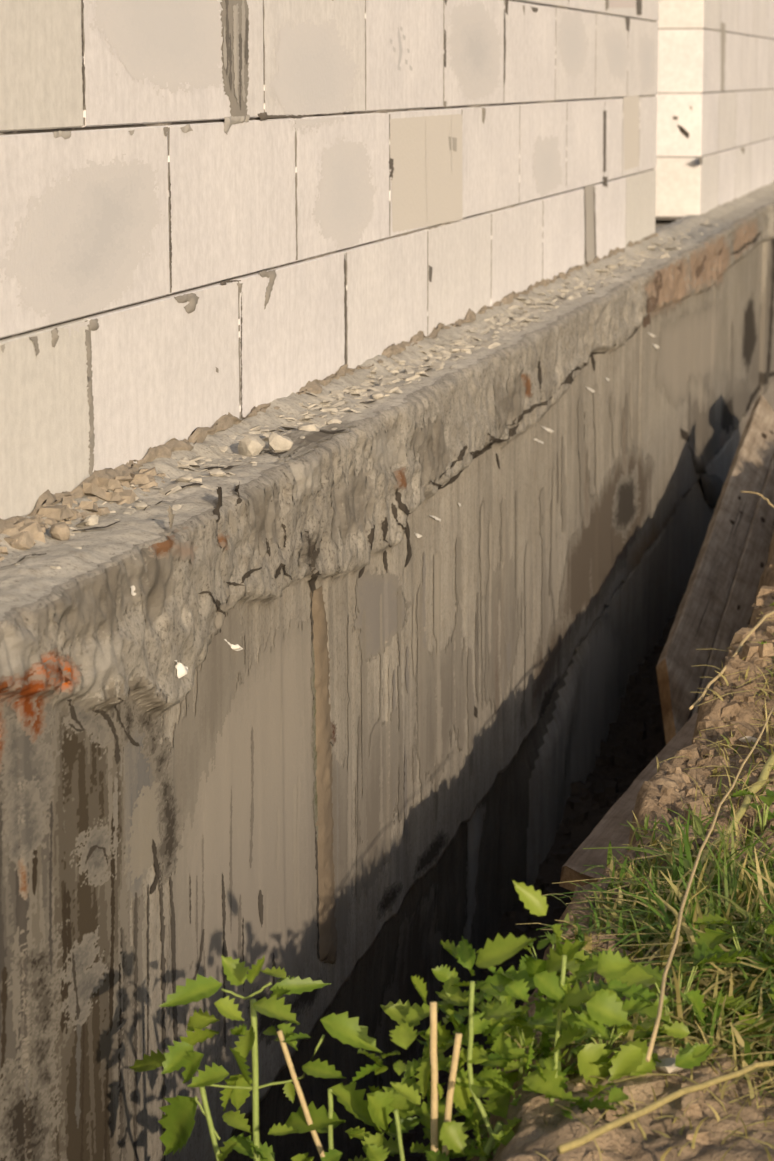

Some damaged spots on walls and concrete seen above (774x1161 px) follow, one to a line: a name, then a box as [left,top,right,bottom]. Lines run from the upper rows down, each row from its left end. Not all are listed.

leakage [0,154,165,336]
crack [73,450,287,531]
crack [199,488,412,664]
crack [430,326,640,490]
leakage [656,243,774,466]
rust [0,647,82,773]
leakage [331,382,641,956]
rust [17,858,29,900]
leakage [0,587,318,1161]
crack [313,826,321,959]